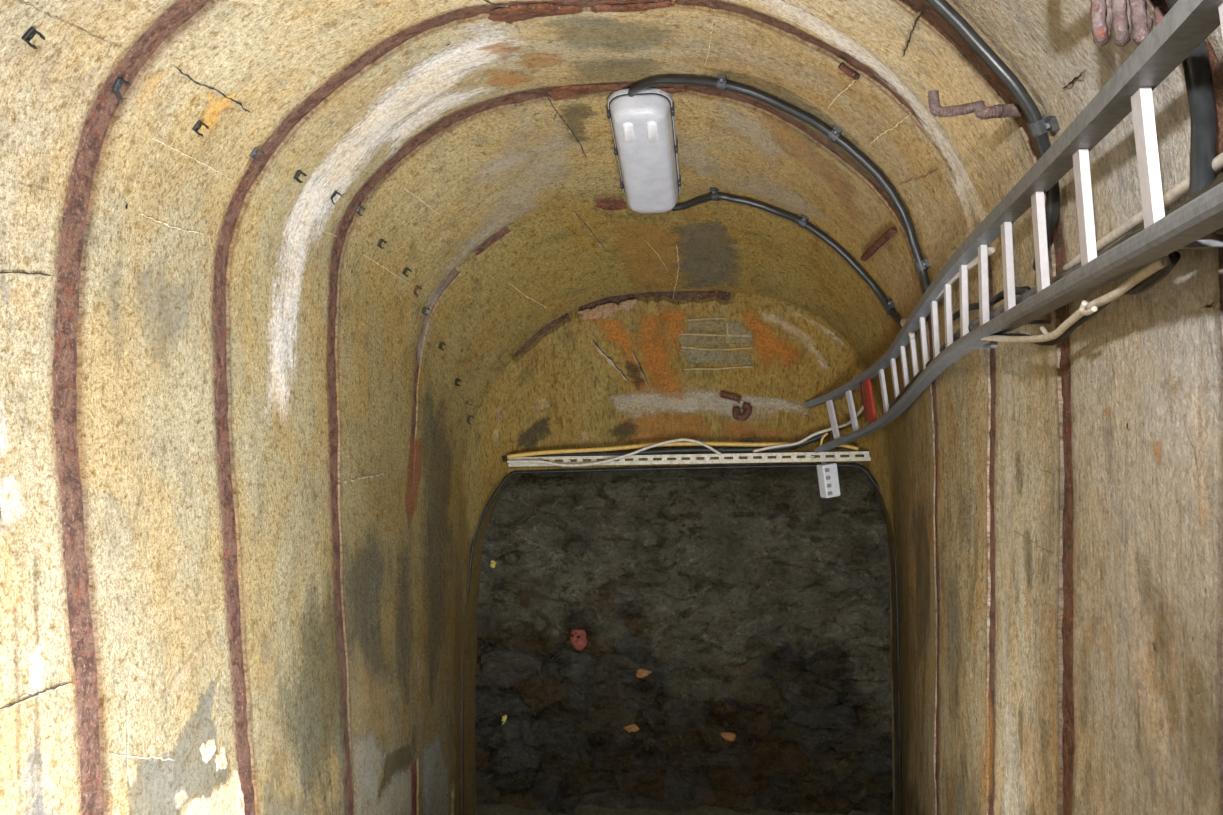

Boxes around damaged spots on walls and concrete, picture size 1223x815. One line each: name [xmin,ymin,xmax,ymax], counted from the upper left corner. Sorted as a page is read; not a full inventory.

crack [16,0,121,47]
crack [173,65,251,113]
leakage [469,105,593,246]
efflorescence [267,22,524,420]
crack [0,271,51,280]
rust [621,413,708,443]
rust [720,391,786,442]
leakage [0,478,21,524]
peeling [127,765,137,786]
peeling [174,739,245,815]